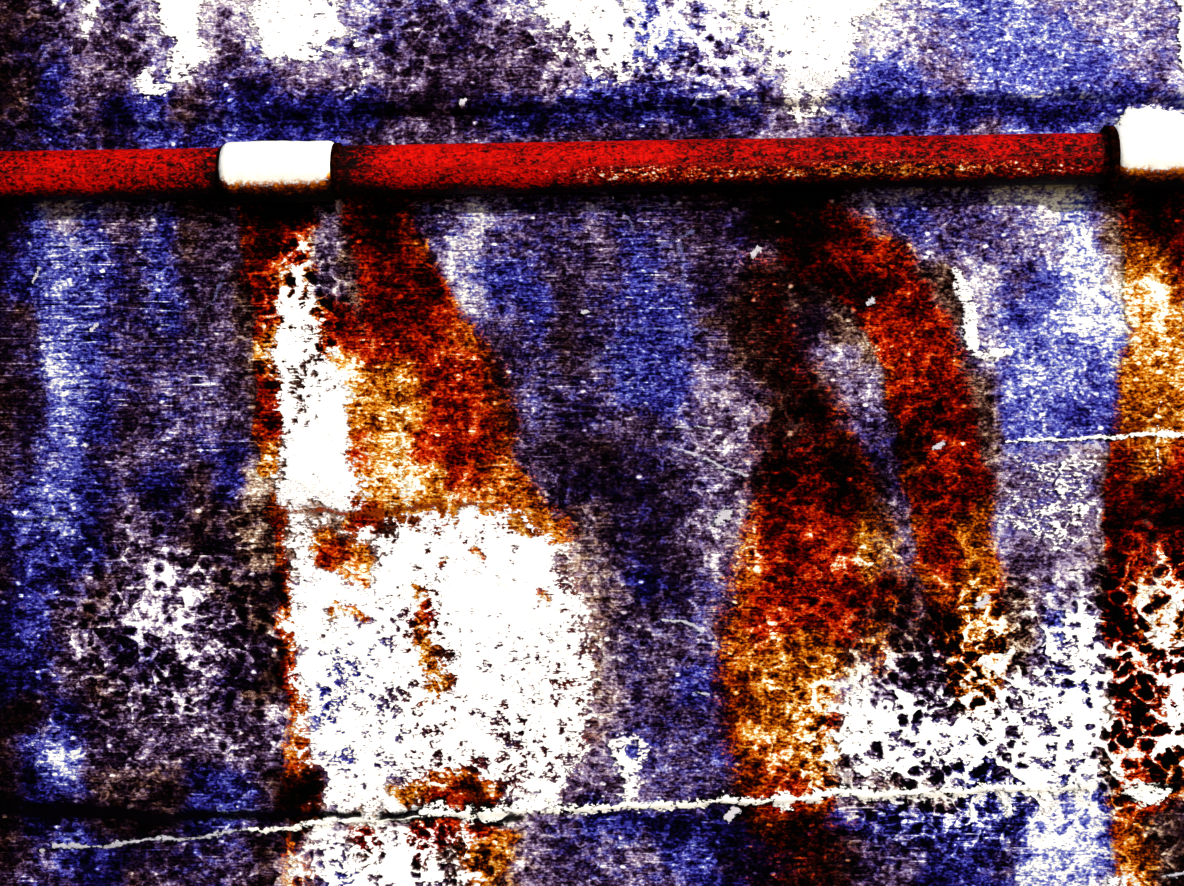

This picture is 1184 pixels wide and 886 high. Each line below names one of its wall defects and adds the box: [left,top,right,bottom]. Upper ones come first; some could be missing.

crack [0,796,524,827]
rust [237,195,600,886]
peeling [252,235,621,886]
rust [711,189,1015,886]
peeling [802,446,1184,818]
crack [1005,401,1184,469]
rust [1100,189,1184,886]